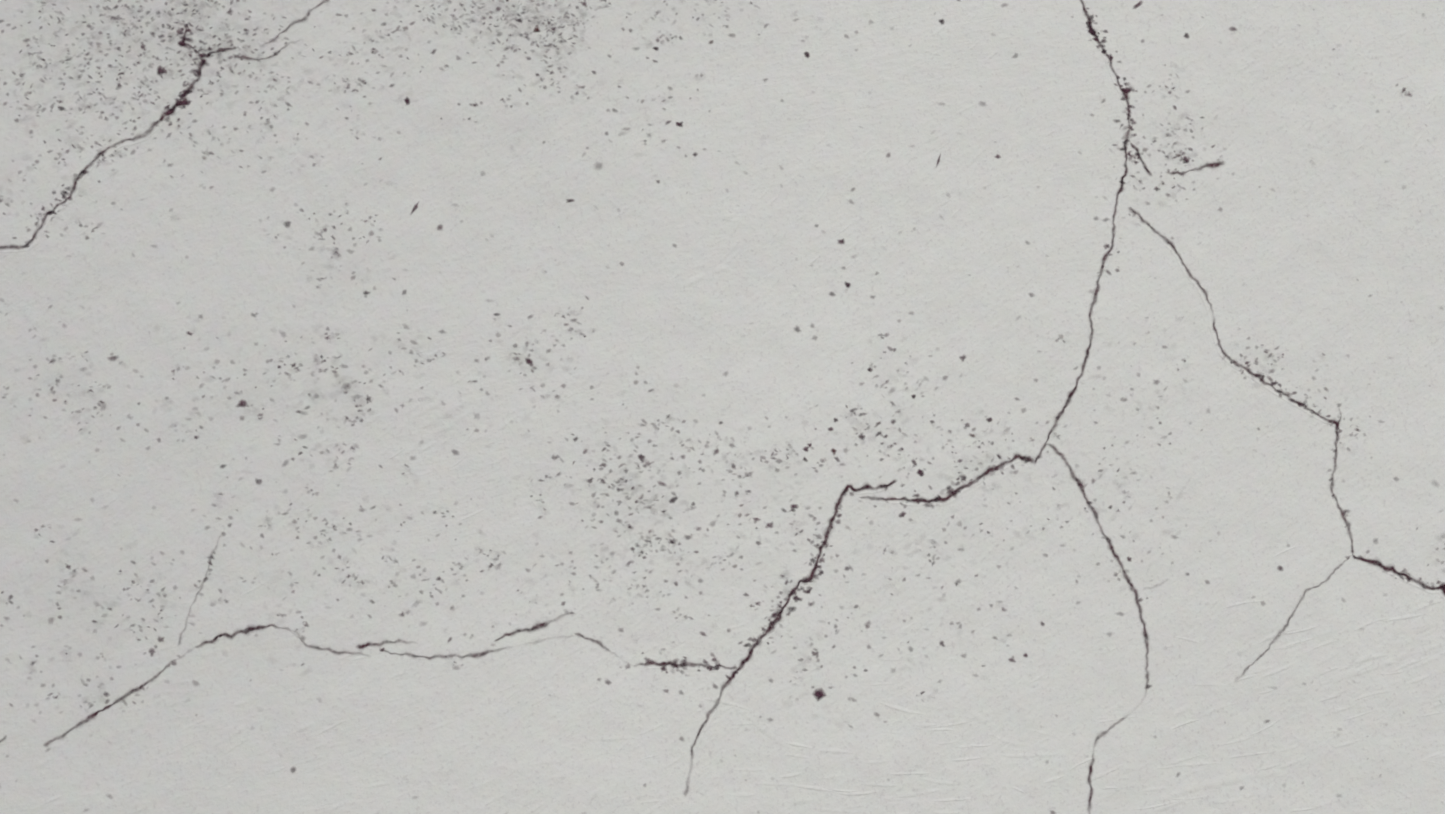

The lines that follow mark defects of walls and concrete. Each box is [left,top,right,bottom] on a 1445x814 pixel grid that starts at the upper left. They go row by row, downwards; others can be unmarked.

crack [0,32,248,253]
crack [644,0,1445,789]
crack [204,625,271,643]
crack [473,623,546,657]
crack [68,672,161,732]
crack [1086,765,1094,805]